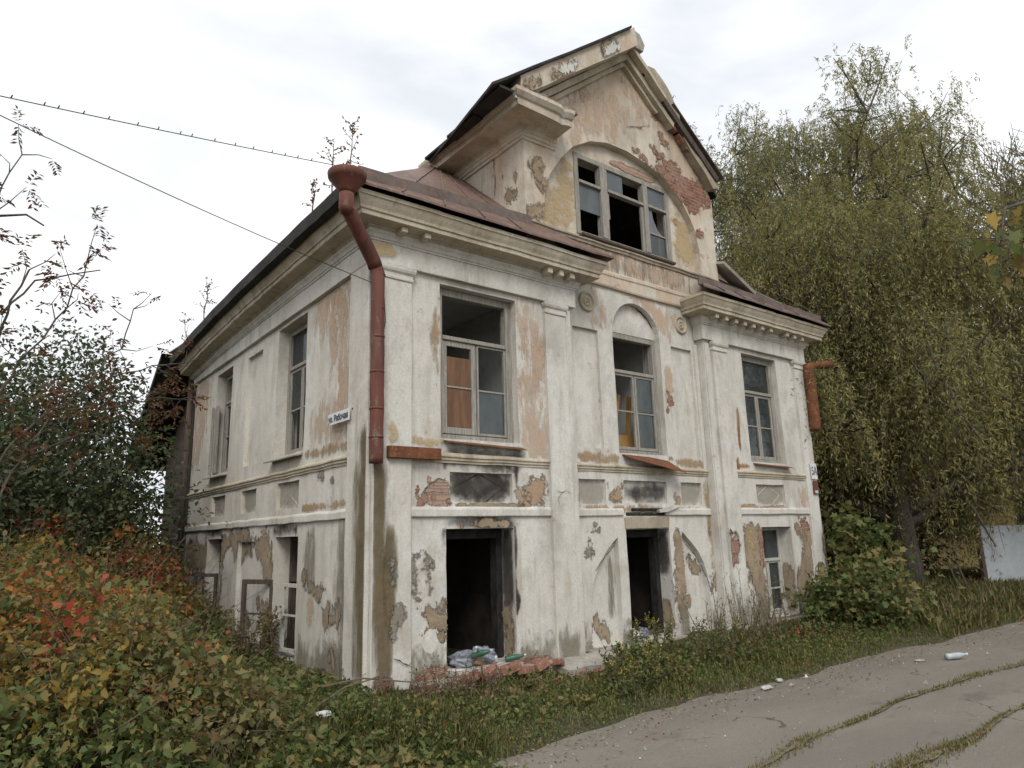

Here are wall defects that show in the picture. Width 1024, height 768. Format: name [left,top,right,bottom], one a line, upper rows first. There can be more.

peeling [513,55,581,98]
peeling [600,37,622,57]
peeling [504,156,549,221]
flaking render [599,114,711,287]
peeling [415,473,549,530]
peeling [301,568,341,636]
leakage [294,425,397,682]
peeling [389,550,448,643]
peeling [592,613,611,644]
peeling [662,528,717,632]
peeling [730,522,768,615]
peeling [741,488,828,611]